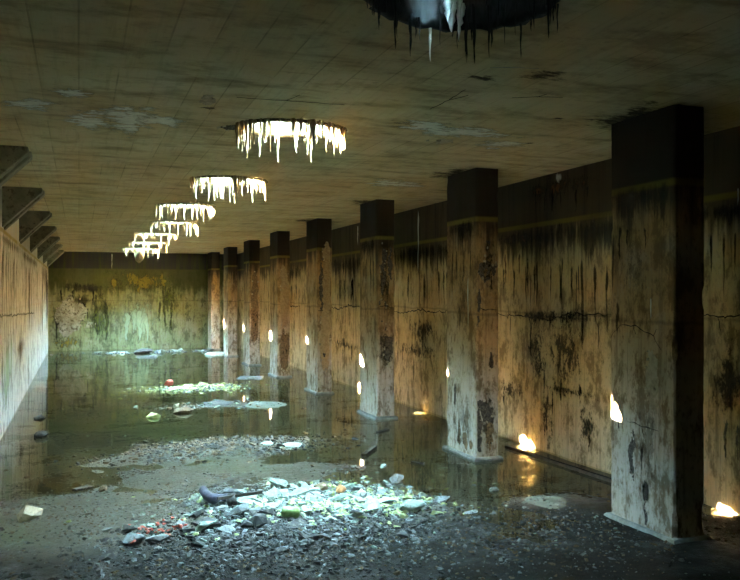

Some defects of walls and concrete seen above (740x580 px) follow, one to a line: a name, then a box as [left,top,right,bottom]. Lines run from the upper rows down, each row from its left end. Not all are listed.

spalling [55,293,96,337]
leakage [60,283,102,319]
leakage [125,302,153,341]
crack [380,305,447,329]
crack [481,304,661,350]
leakage [503,184,668,450]
spalling [457,399,495,452]
leakage [479,379,522,445]